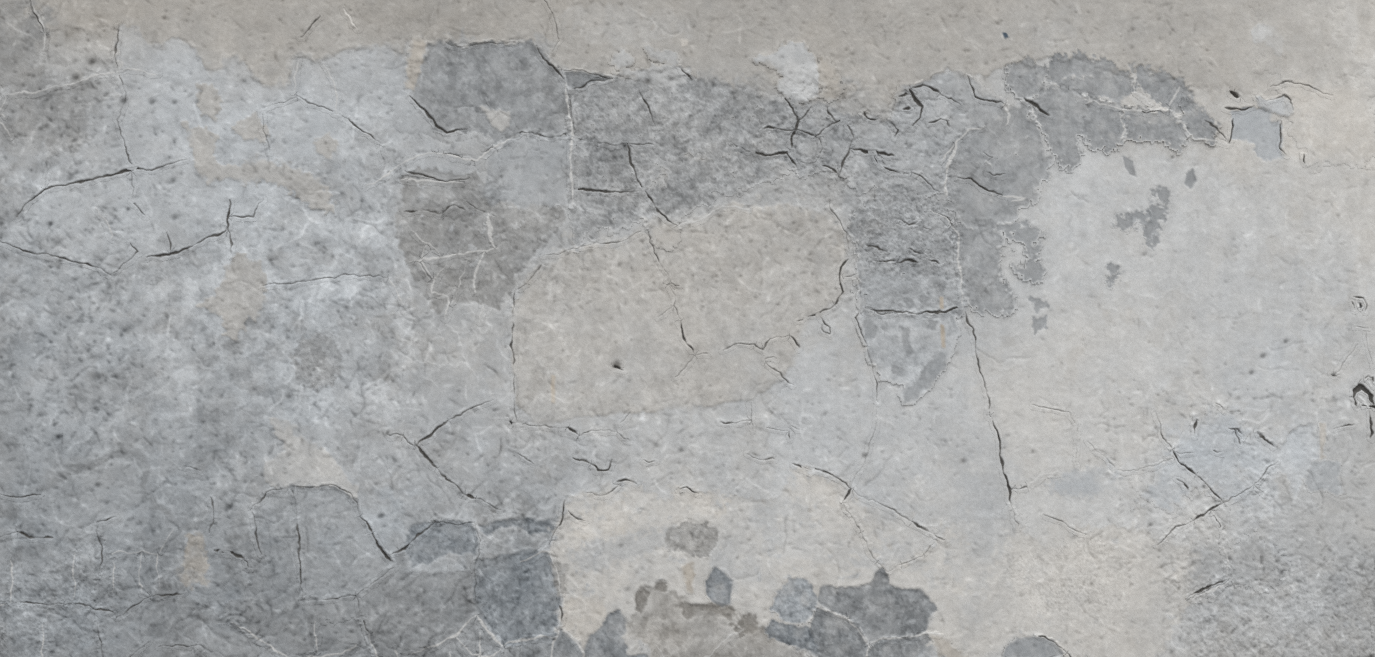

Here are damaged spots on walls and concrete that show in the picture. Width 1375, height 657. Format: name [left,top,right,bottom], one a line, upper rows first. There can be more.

crack [0,0,268,280]
crack [1075,72,1336,168]
crack [177,0,1090,657]
crack [0,480,209,657]
peeling [262,416,388,596]
peeling [406,472,1198,657]
crack [1114,399,1281,604]